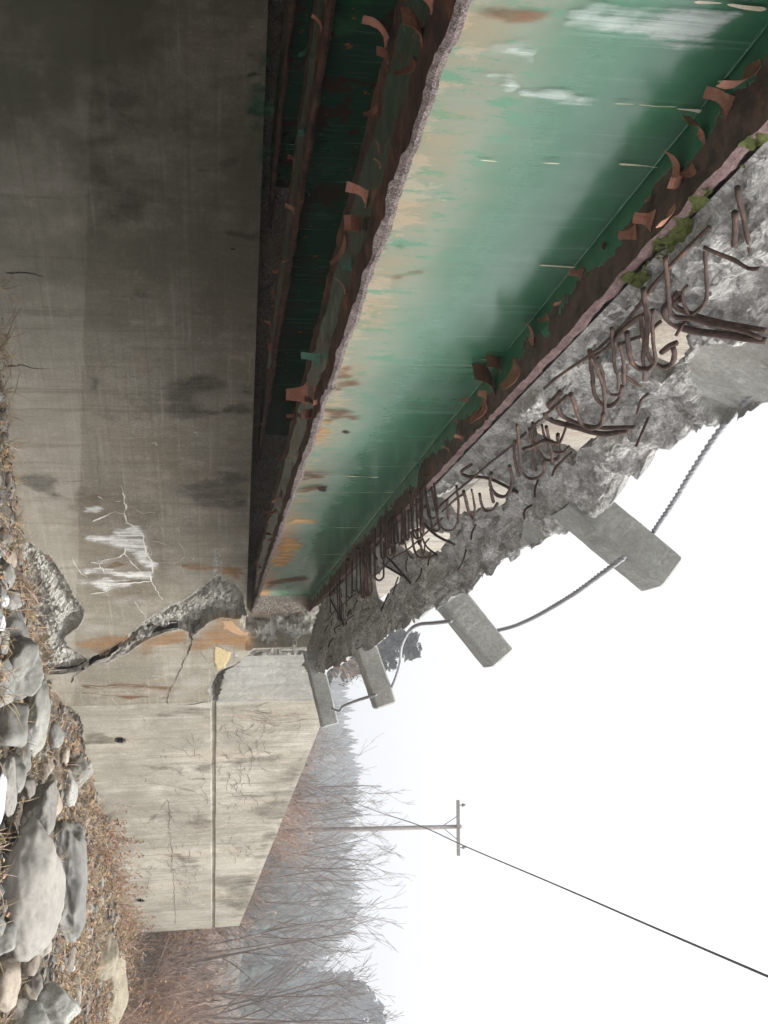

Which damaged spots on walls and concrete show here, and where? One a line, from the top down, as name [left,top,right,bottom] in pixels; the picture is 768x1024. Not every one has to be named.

peeling [361,6,422,75]
peeling [703,59,762,120]
peeling [286,334,326,419]
spalling [302,141,768,676]
damp [82,525,158,591]
spalling [21,539,249,674]
crack [45,442,301,923]